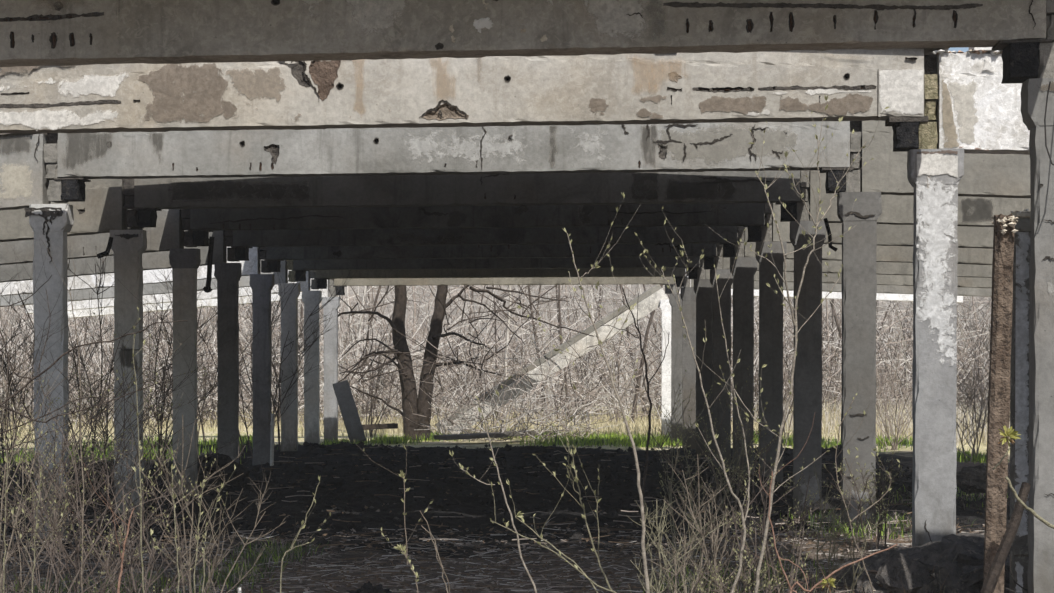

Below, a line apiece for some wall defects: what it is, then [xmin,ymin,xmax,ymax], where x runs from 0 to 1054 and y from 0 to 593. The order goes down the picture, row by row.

peeling [0,60,341,131]
spalling [422,103,469,120]
spalling [249,144,279,171]
crack [622,124,783,185]
crack [43,217,52,262]
peeling [916,80,978,376]